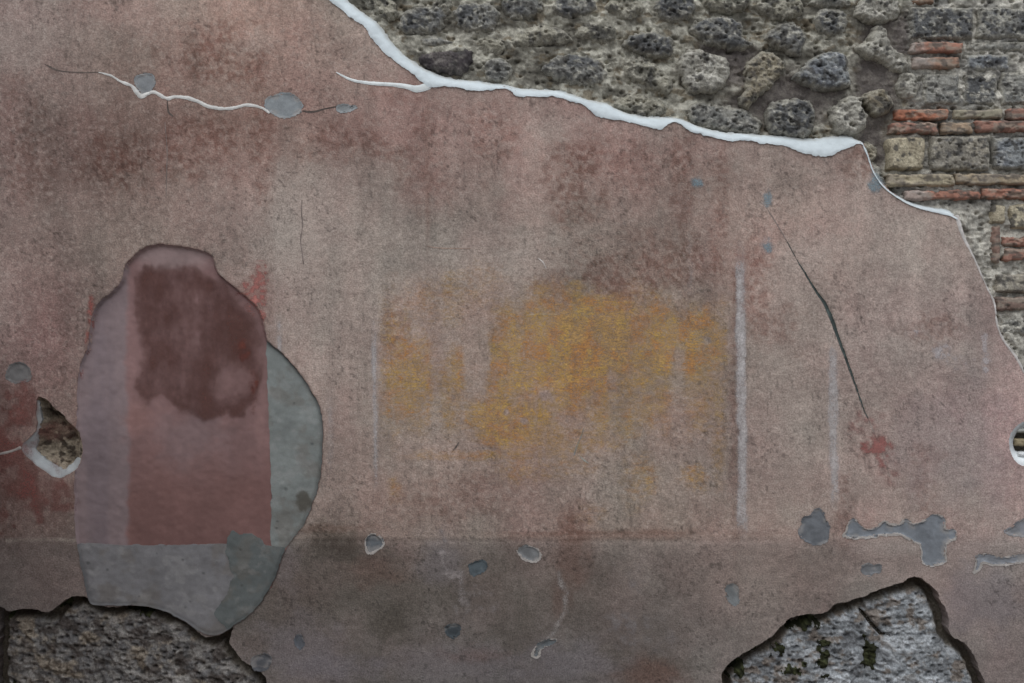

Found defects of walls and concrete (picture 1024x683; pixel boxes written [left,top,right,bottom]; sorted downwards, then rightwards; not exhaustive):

crack [44,64,270,195]
crack [302,105,336,113]
spalling [348,0,1024,374]
water stain [138,266,267,419]
crack [768,210,890,476]
flaking render [2,244,324,683]
spalling [842,514,957,567]
spalling [721,576,981,683]